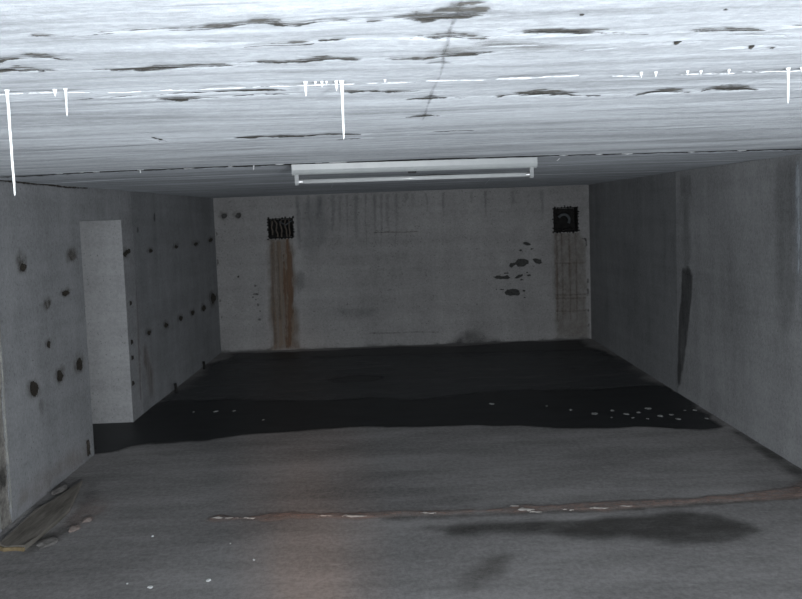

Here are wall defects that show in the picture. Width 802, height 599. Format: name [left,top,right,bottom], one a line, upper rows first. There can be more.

spalling [393,1,490,23]
spalling [497,89,601,98]
spalling [494,242,542,280]
rust [271,239,298,350]
water stain [93,269,722,454]